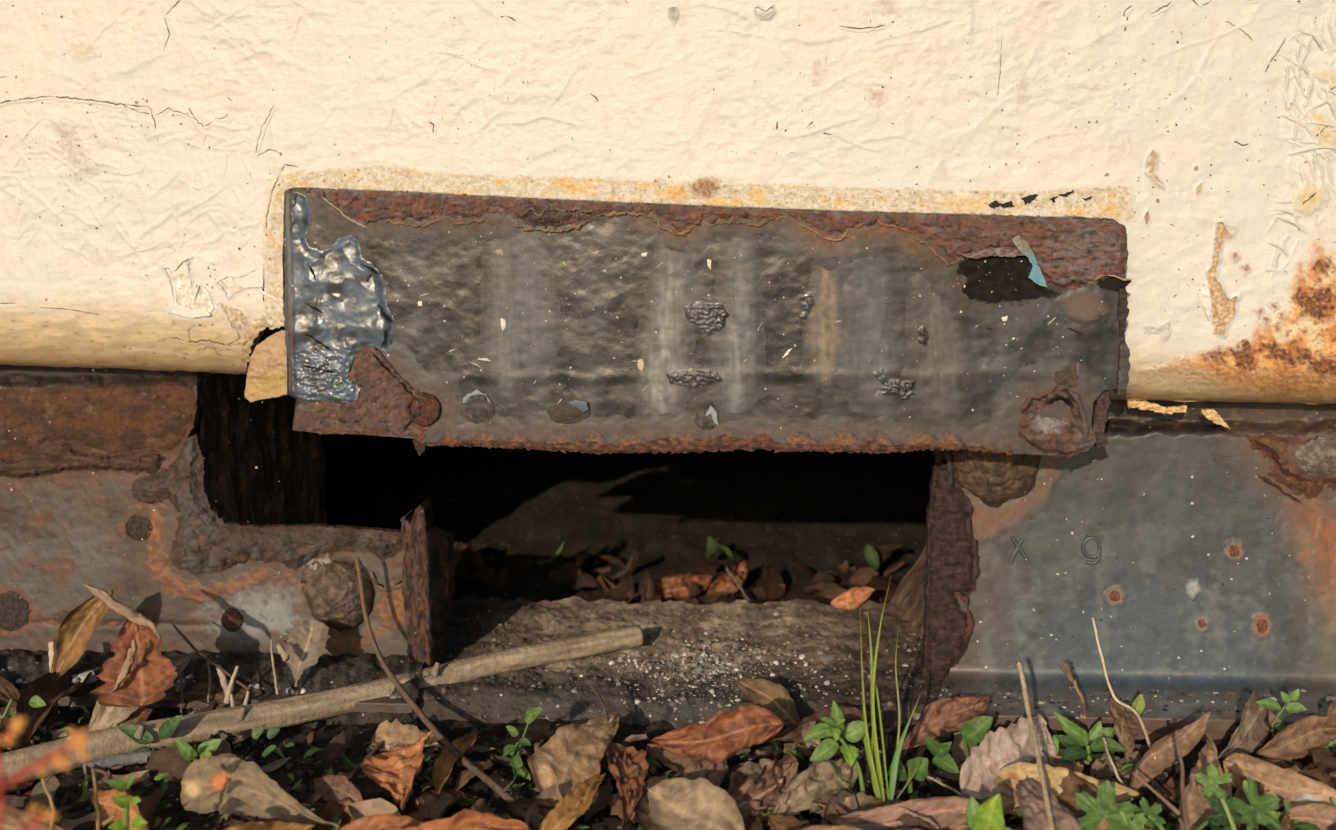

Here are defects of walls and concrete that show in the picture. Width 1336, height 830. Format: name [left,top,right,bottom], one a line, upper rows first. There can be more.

crack [0,77,232,140]
peeling [1143,147,1166,191]
crack [0,303,100,315]
crack [169,325,240,357]
crack [255,106,297,358]
peeling [159,163,1153,334]
peeling [1197,217,1244,341]
rust [293,177,1336,692]
rust [0,380,406,656]